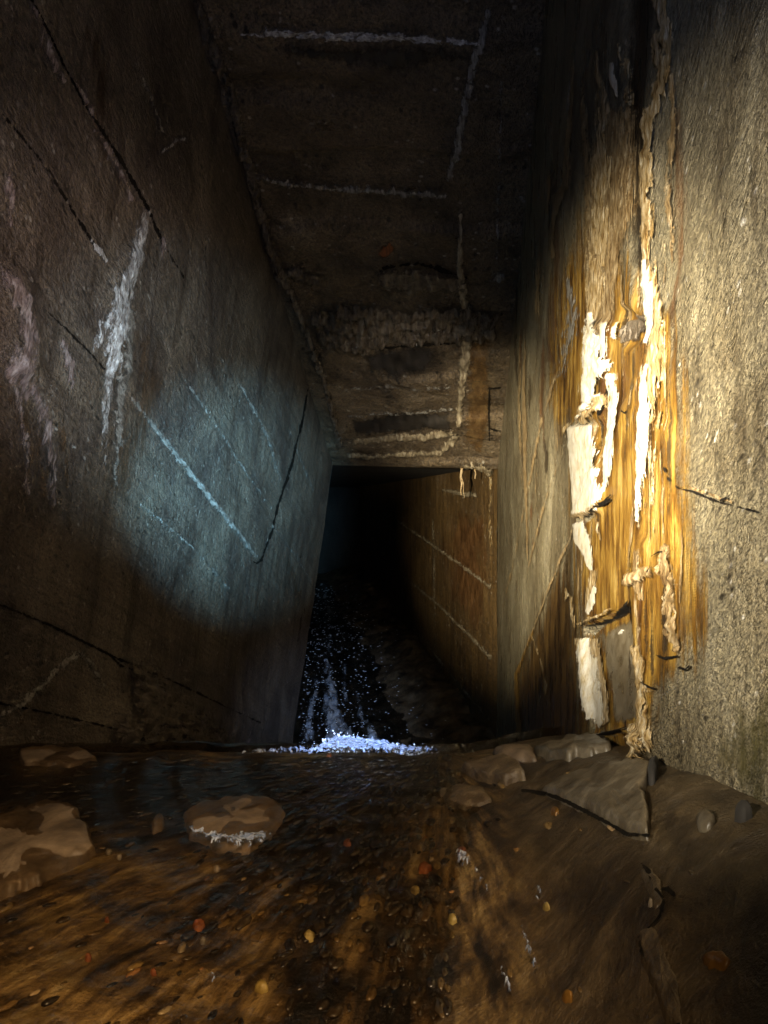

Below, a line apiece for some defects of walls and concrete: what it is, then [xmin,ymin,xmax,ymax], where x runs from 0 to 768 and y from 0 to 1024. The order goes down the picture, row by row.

crack [2,114,108,263]
crack [30,0,184,279]
leakage [93,211,151,493]
crack [253,385,309,564]
leakage [354,413,450,435]
leakage [367,347,444,378]
spalling [562,386,610,615]
spalling [618,314,646,343]
crack [663,467,756,512]
spalling [574,621,636,729]